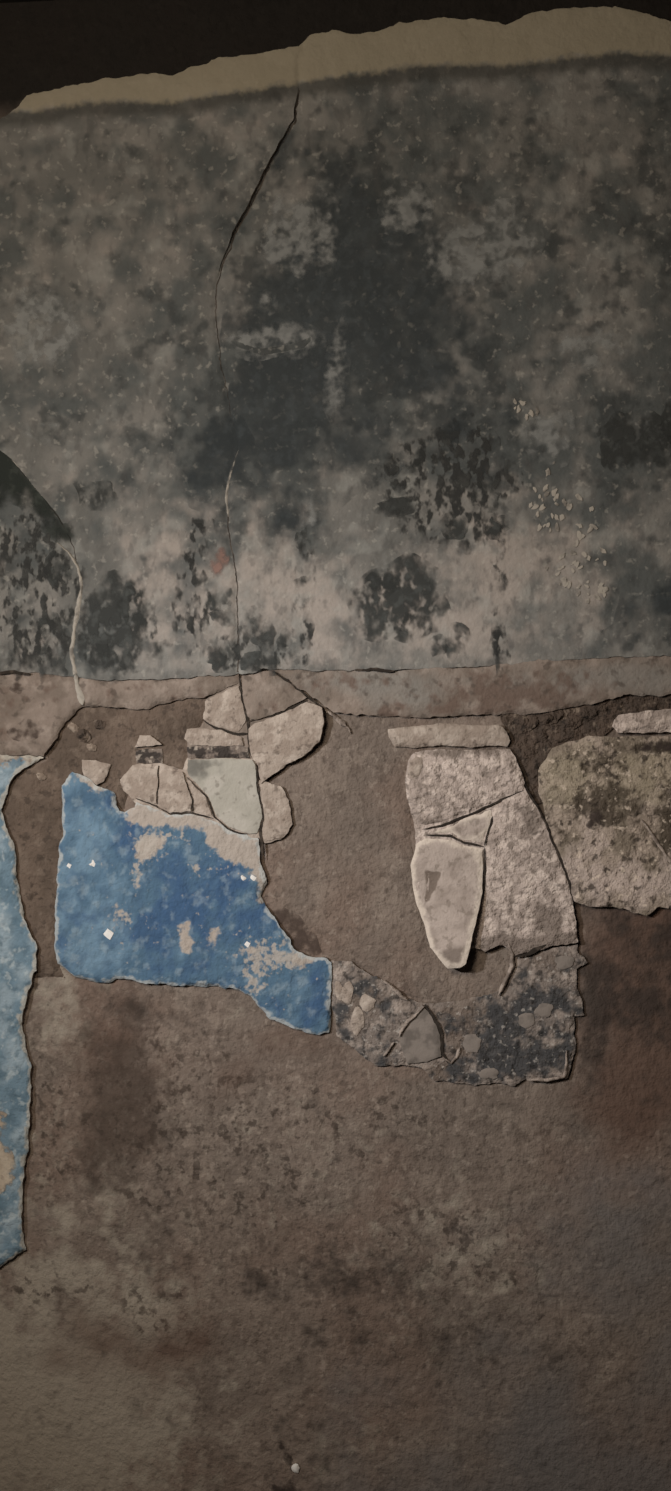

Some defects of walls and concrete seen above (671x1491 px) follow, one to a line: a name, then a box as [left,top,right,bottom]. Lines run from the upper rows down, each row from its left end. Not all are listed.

leakage [264,200,331,274]
leakage [382,184,432,229]
leakage [429,199,535,281]
leakage [4,288,78,361]
leakage [239,325,314,355]
crack [136,89,322,859]
mould [378,420,514,547]
leakage [0,451,161,675]
leakage [173,519,314,676]
mould [350,553,469,656]
leakage [493,613,502,670]
spalling [0,694,671,1373]